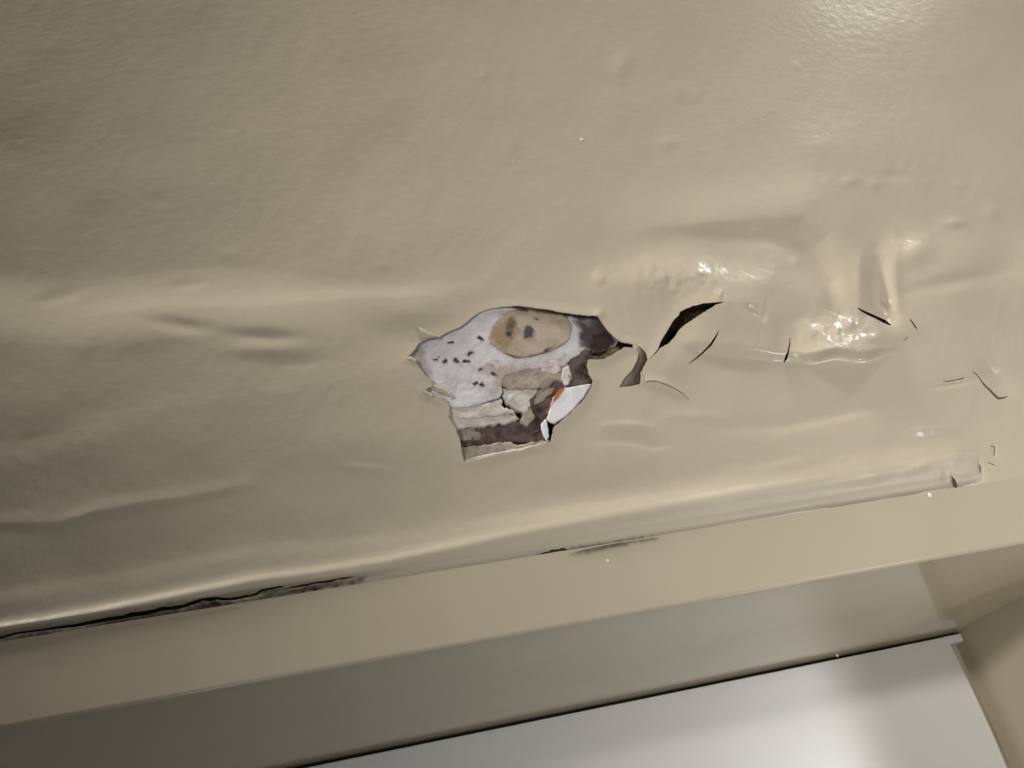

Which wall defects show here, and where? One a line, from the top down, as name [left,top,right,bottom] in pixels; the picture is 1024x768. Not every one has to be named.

crack [620,302,723,400]
crack [858,308,917,340]
peeling [407,303,788,463]
crack [943,372,1008,400]
crack [0,576,355,639]